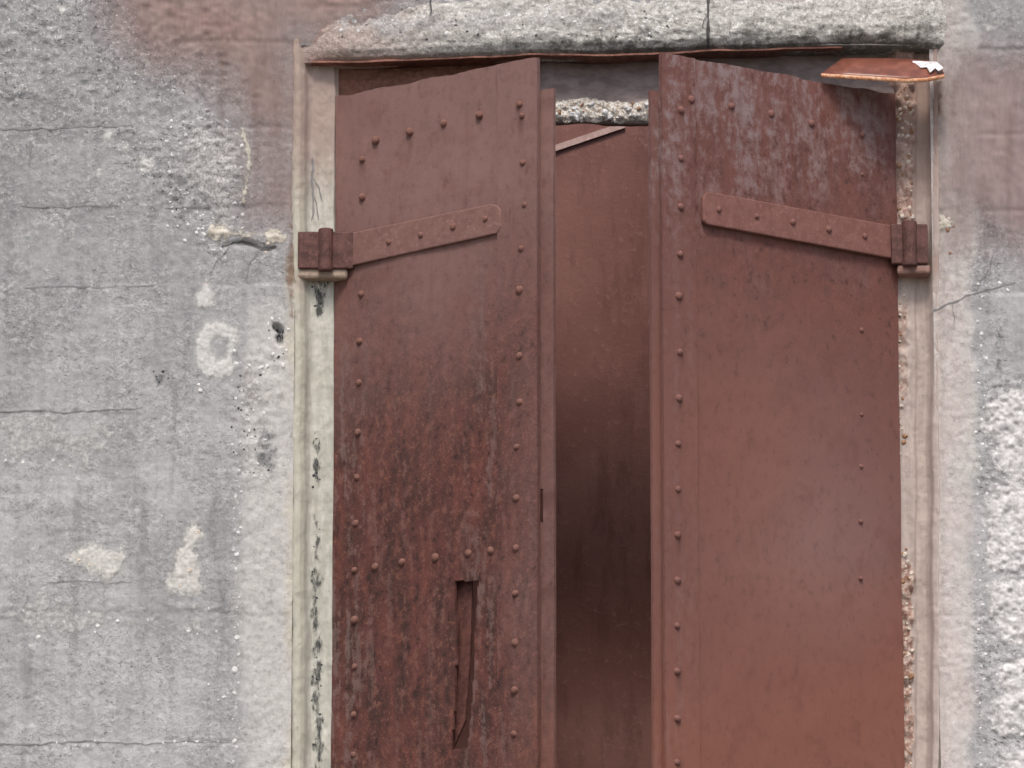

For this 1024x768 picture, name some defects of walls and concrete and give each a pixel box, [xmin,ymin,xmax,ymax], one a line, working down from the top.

rust [339,66,489,95]
spalling [896,86,914,192]
crack [165,207,287,278]
crack [932,256,1016,321]
peeling [217,317,290,765]